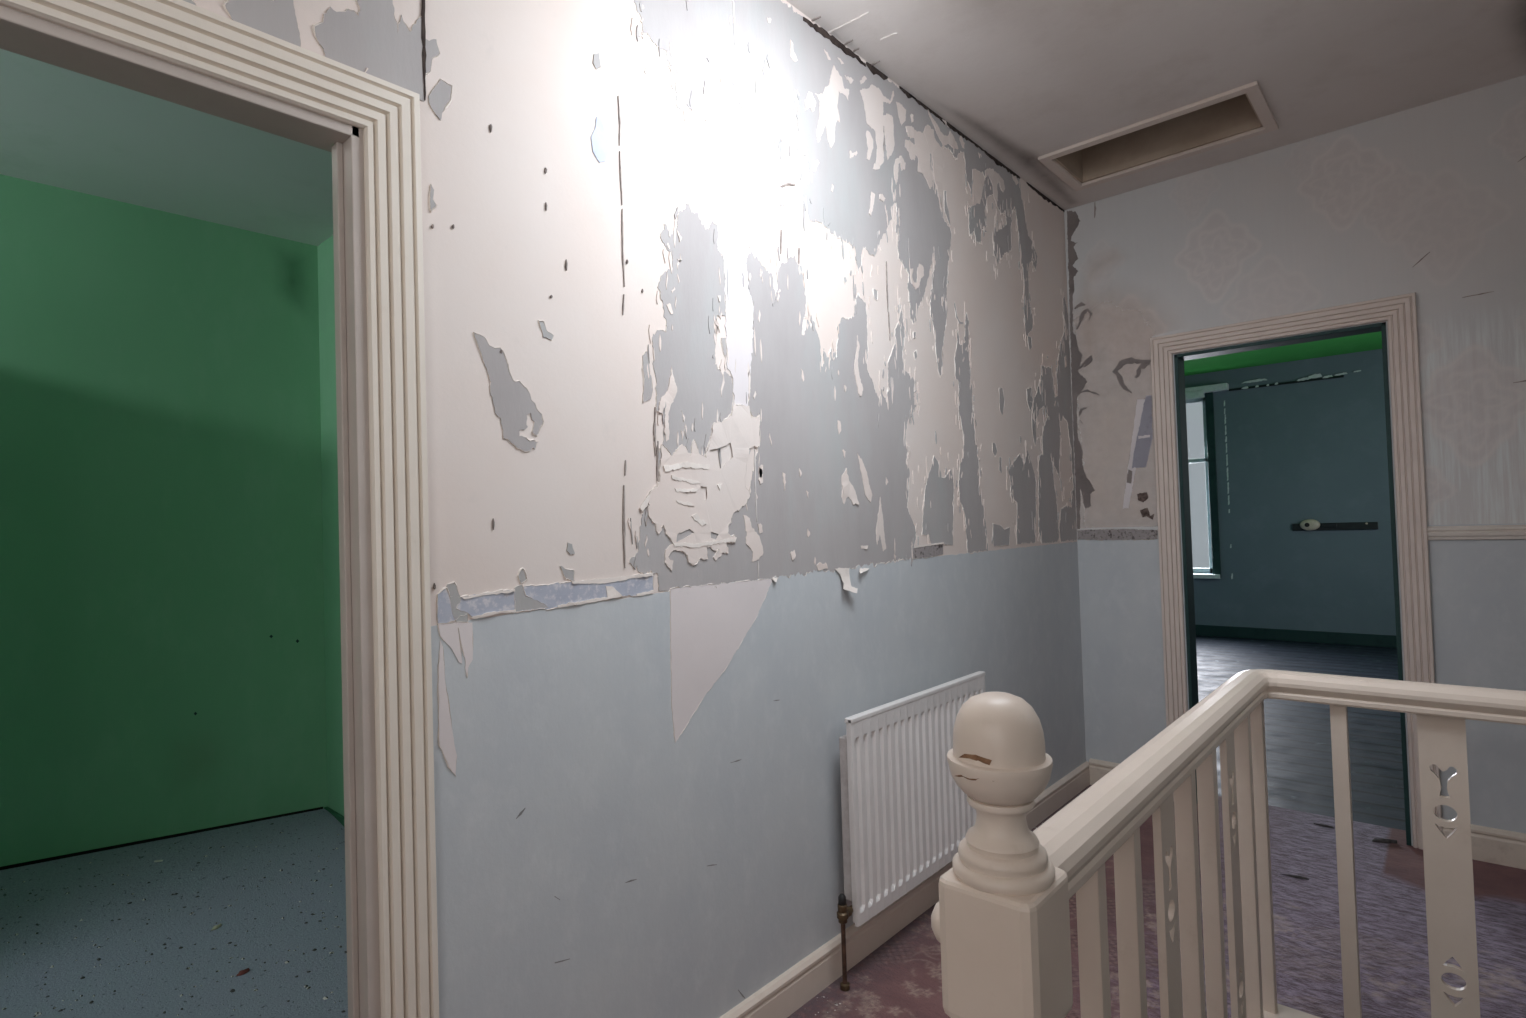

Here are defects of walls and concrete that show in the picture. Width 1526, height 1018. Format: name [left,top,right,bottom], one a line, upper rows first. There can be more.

peeling [222,0,453,120]
peeling [428,184,437,229]
peeling [627,0,1095,592]
peeling [538,320,554,341]
peeling [473,332,544,452]
peeling [1127,395,1153,483]
peeling [560,543,575,582]
peeling [433,581,468,624]
peeling [514,567,548,613]